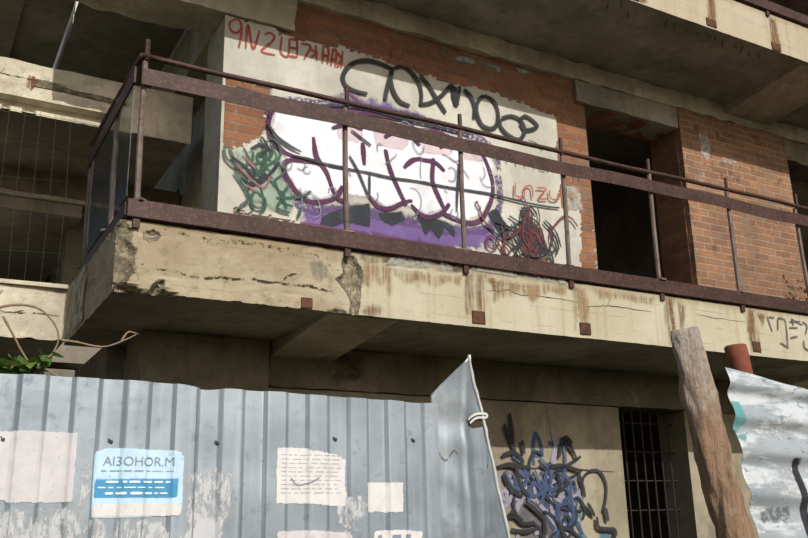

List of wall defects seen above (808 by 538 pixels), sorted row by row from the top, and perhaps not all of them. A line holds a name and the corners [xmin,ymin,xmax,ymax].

peeling [226,79,271,95]
peeling [277,5,588,167]
peeling [224,101,269,150]
peeling [559,174,597,269]
spalling [112,220,176,296]
spalling [323,255,363,315]
corrosion [666,298,684,330]
corrosion [748,309,764,345]